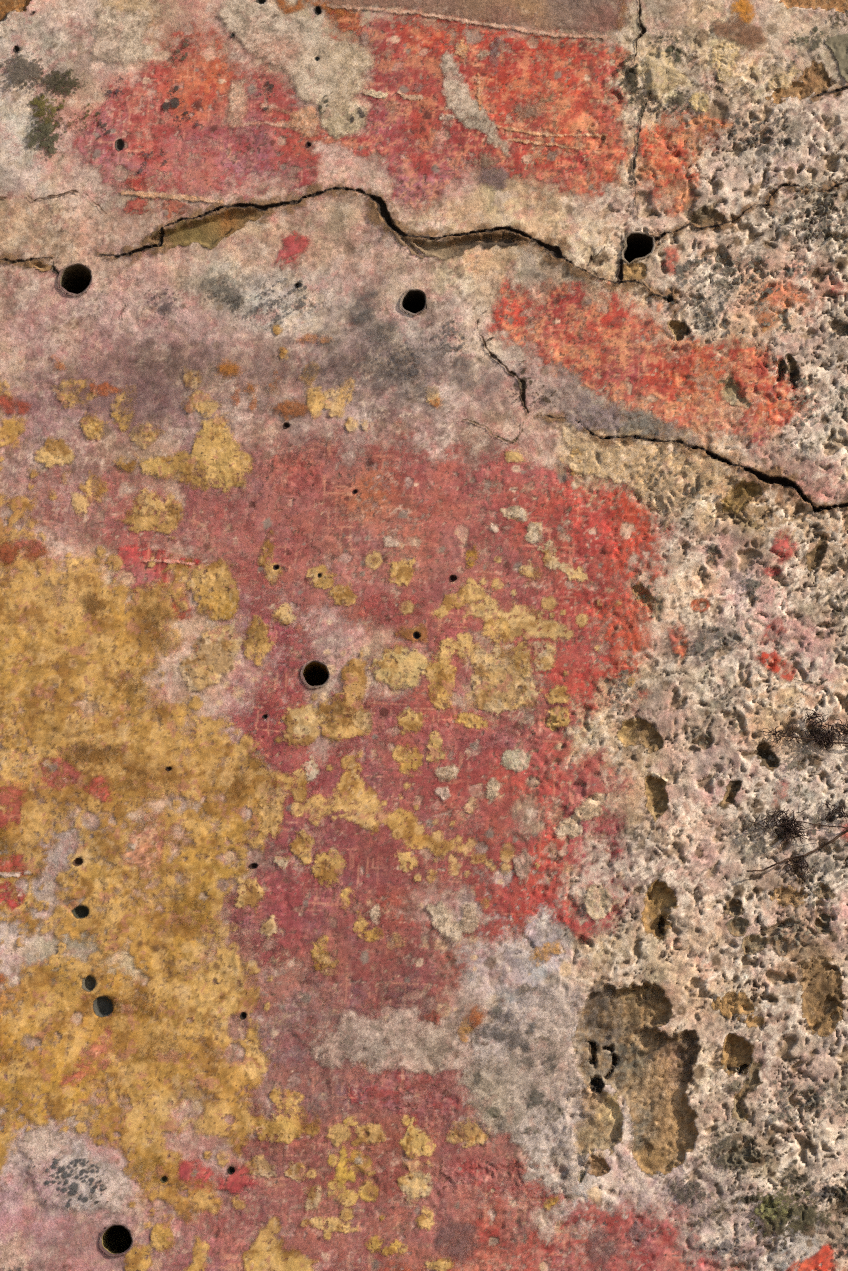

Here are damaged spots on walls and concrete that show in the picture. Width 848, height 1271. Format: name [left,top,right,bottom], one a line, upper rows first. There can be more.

spalling [0,0,35,52]
crack [632,0,646,65]
crack [811,84,848,102]
crack [631,103,848,249]
crack [0,252,59,275]
crack [97,179,687,315]
crack [452,310,848,515]
peeling [553,792,607,838]
peeling [427,898,489,942]
peeling [584,884,612,920]
spalling [711,991,765,1122]
spalling [243,973,701,1256]